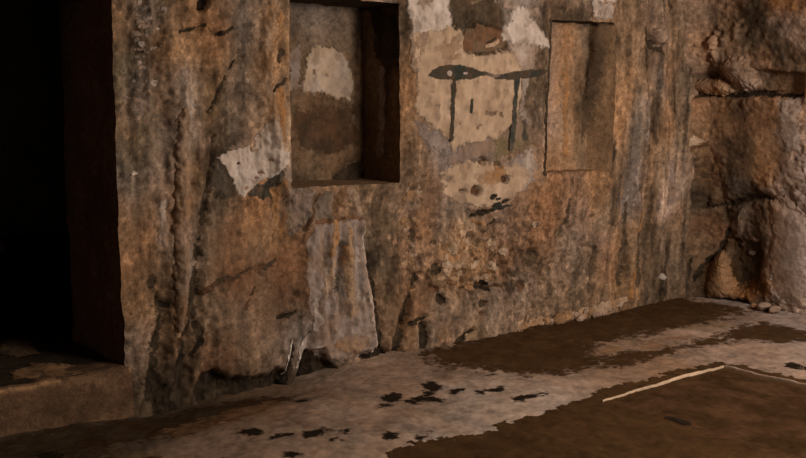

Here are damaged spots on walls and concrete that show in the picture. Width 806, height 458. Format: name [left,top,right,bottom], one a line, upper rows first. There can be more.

peeling [408,0,452,38]
peeling [592,0,616,18]
peeling [462,6,550,71]
peeling [219,118,290,198]
spalling [358,348,385,359]